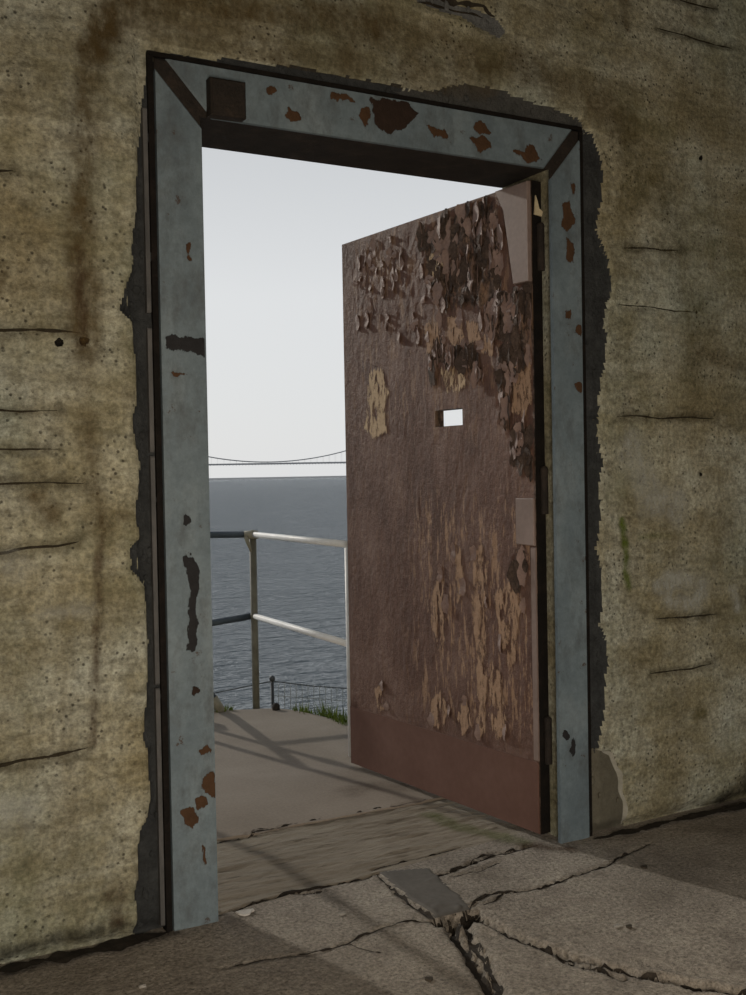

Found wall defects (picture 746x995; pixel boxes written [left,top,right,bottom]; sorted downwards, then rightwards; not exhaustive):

corrosion [285,107,301,122]
corrosion [330,92,419,135]
corrosion [426,125,448,139]
corrosion [470,120,492,153]
corrosion [513,144,542,163]
corrosion [561,183,576,263]
spalling [142,53,612,753]
corrosion [180,771,215,828]
crack [217,802,746,995]